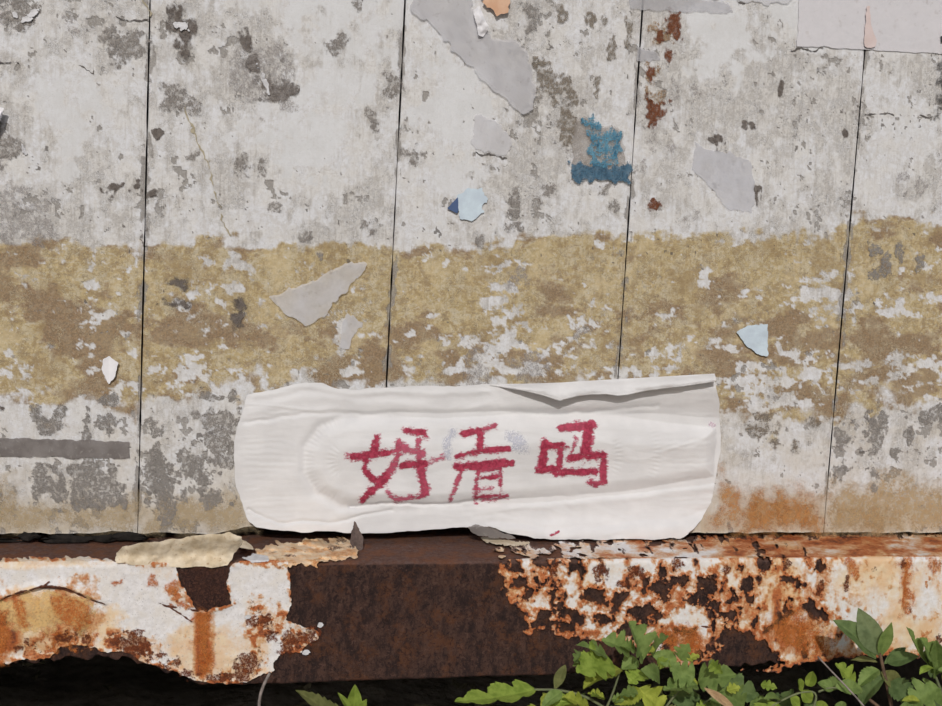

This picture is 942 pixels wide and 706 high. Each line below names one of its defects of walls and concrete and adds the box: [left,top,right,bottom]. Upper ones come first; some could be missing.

corrosion [644,12,683,128]
peeling [29,404,68,436]
peeling [31,457,129,513]
peeling [79,392,119,440]
peeling [140,389,242,526]
corrosion [714,486,821,537]
peeling [834,402,942,493]
peeling [0,532,358,685]
corrosion [592,558,646,588]
corrosion [843,557,859,592]
corrosion [899,558,915,614]
corrosion [664,628,701,654]